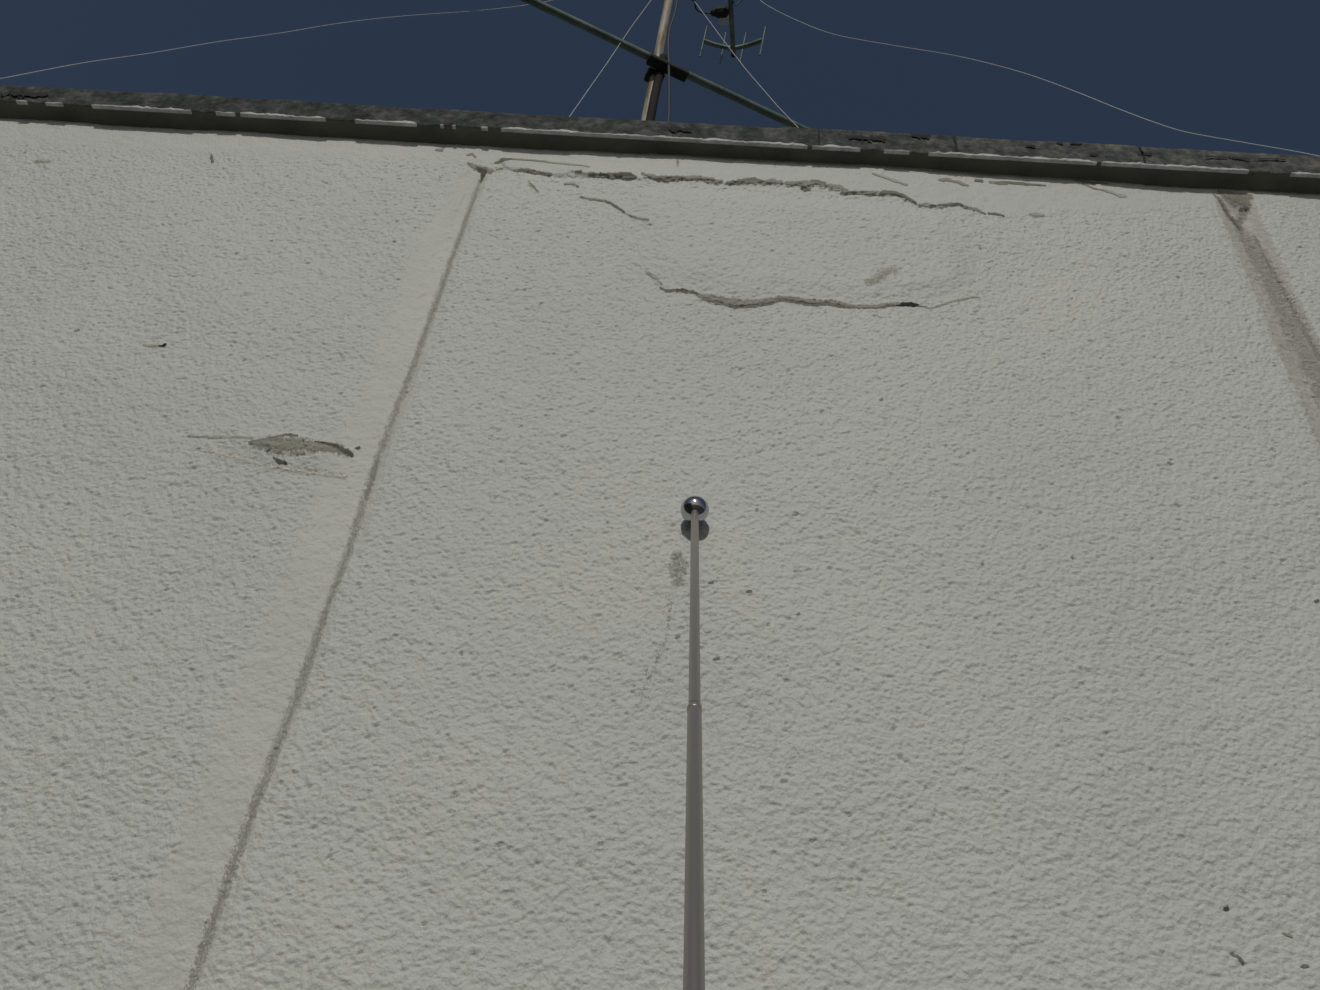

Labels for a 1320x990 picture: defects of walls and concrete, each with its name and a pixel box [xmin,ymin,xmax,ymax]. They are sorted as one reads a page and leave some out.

crack [435,136,1127,220]
crack [646,271,980,309]
water stain [1212,189,1320,414]
spalling [248,434,360,465]